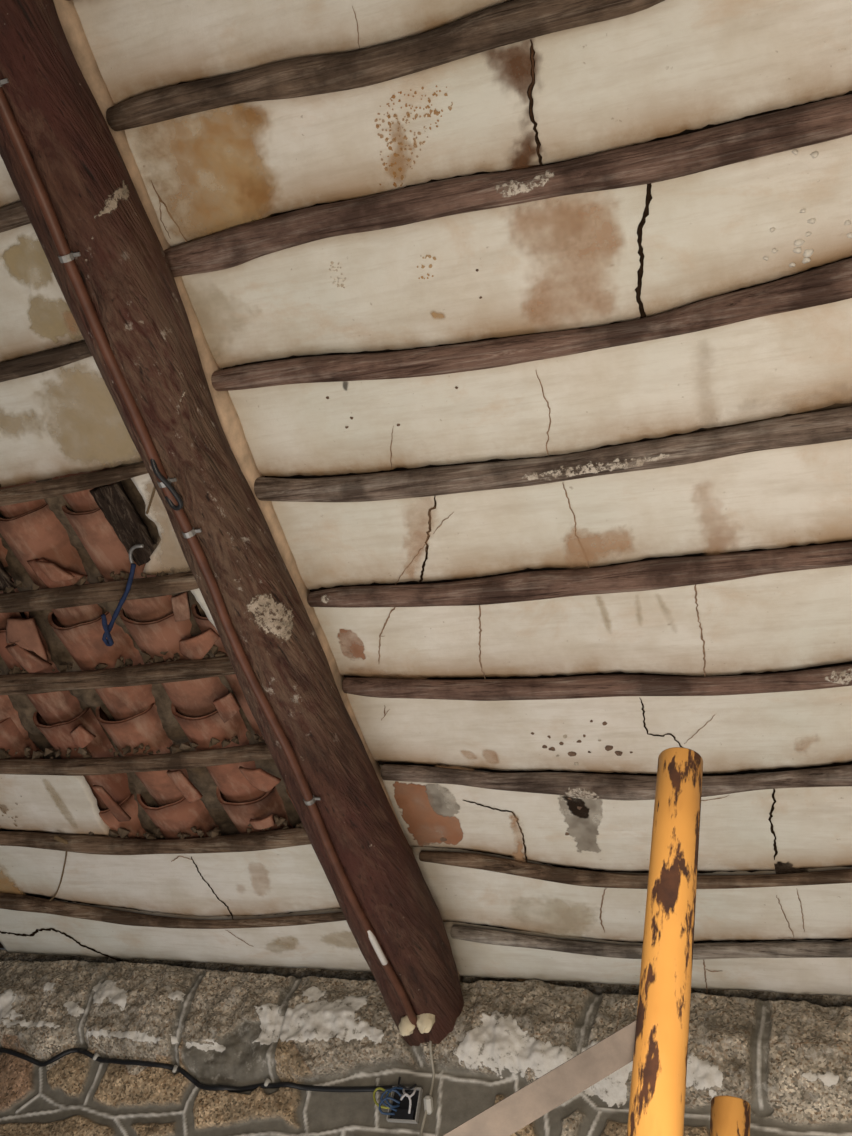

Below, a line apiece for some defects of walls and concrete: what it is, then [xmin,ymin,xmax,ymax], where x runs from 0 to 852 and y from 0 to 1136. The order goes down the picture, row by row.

water stain [154,104,274,234]
corrosion [375,85,453,187]
crack [527,39,543,166]
water stain [2,237,82,342]
crack [635,183,652,318]
water stain [48,368,138,465]
crack [378,496,453,662]
crack [640,699,713,747]
flaking render [393,781,463,847]
flaking render [558,787,602,853]
water stain [0,871,23,895]
crack [0,928,122,962]